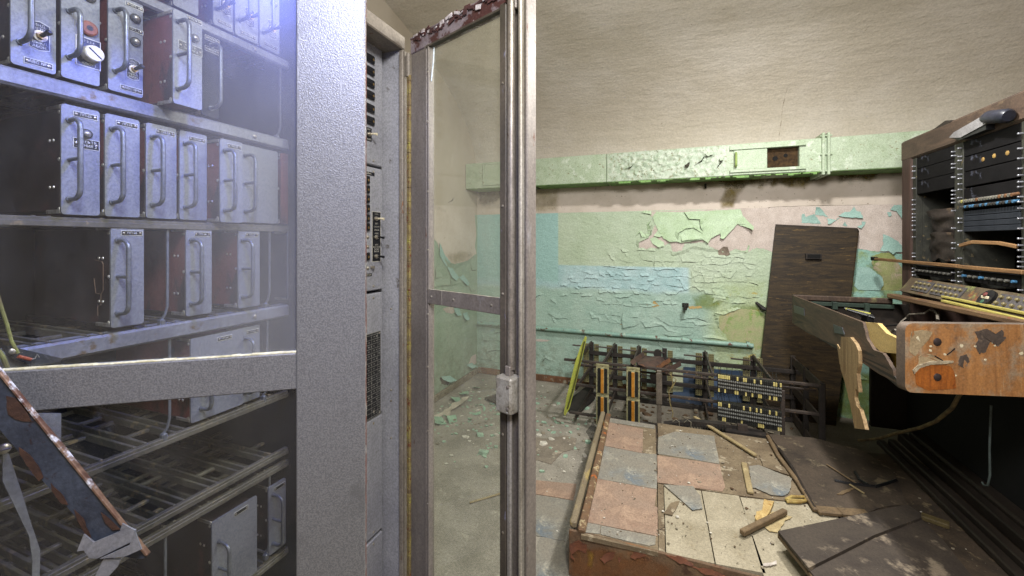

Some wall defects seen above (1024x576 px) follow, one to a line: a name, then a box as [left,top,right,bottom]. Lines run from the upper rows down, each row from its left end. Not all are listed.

peeling [434,205,477,294]
peeling [549,204,902,365]